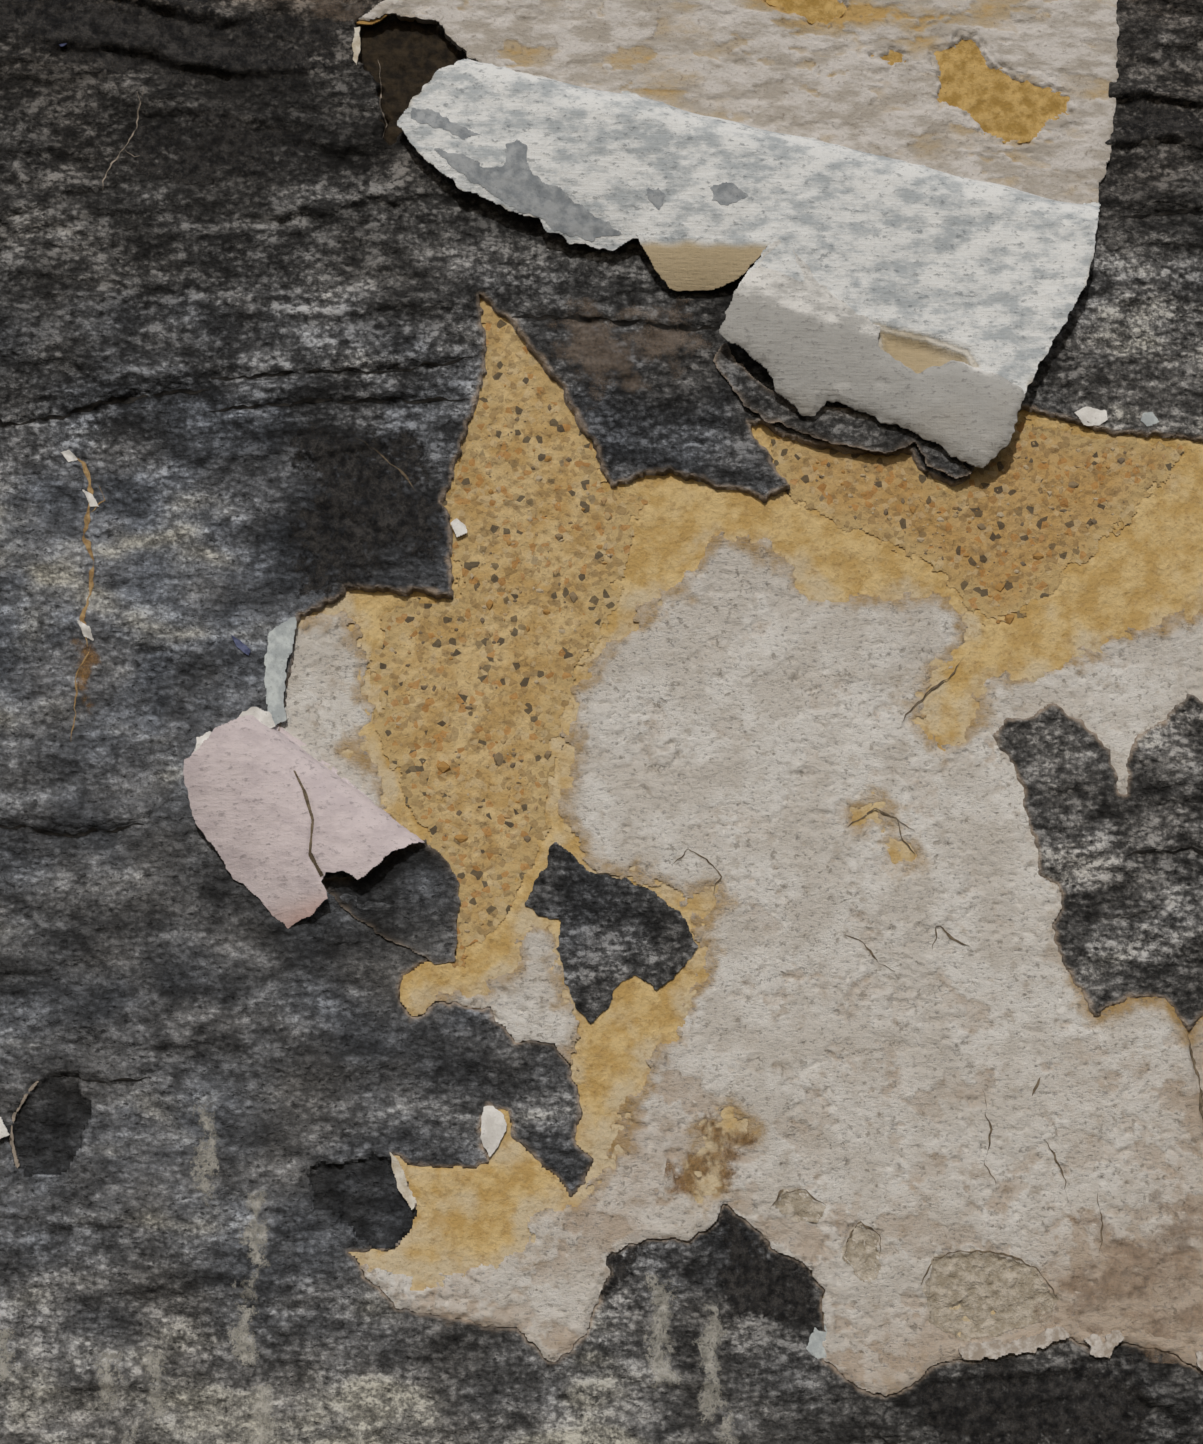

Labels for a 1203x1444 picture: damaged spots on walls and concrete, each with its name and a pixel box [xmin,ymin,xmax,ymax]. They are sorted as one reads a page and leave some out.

peeling [352,0,1119,479]
spalling [0,1073,91,1177]
peeling [183,298,1203,1396]
crack [1187,1034,1203,1119]